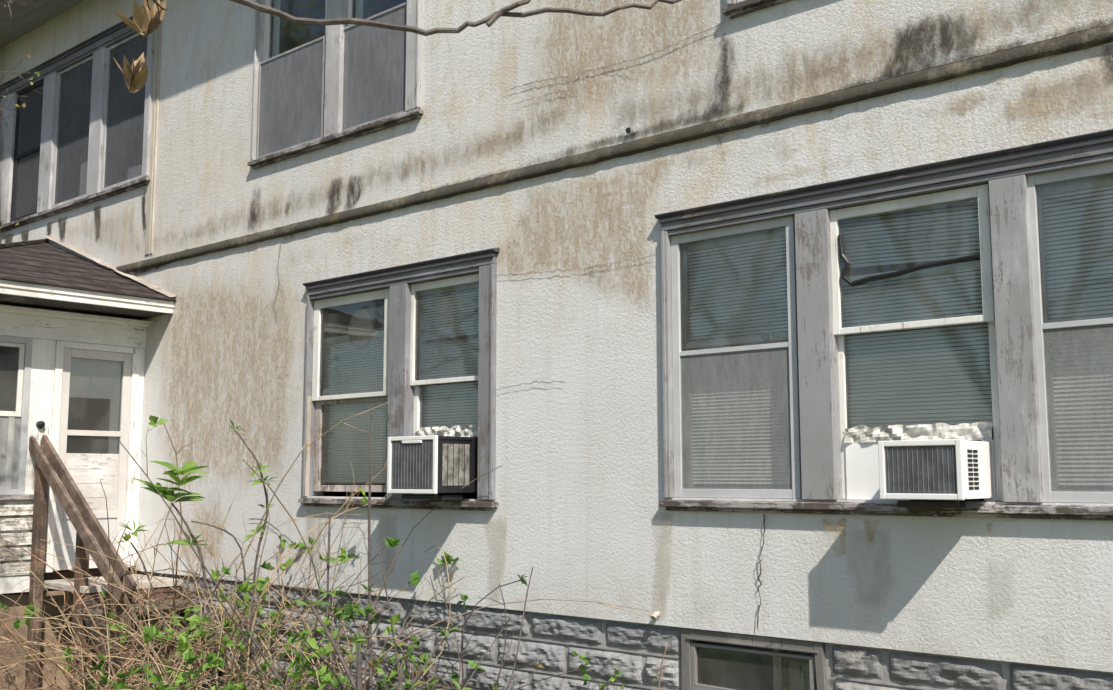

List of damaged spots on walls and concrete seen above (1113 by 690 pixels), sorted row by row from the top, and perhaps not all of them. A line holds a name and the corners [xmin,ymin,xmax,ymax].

damp [844,15,1023,90]
damp [328,176,371,215]
crack [756,515,765,629]